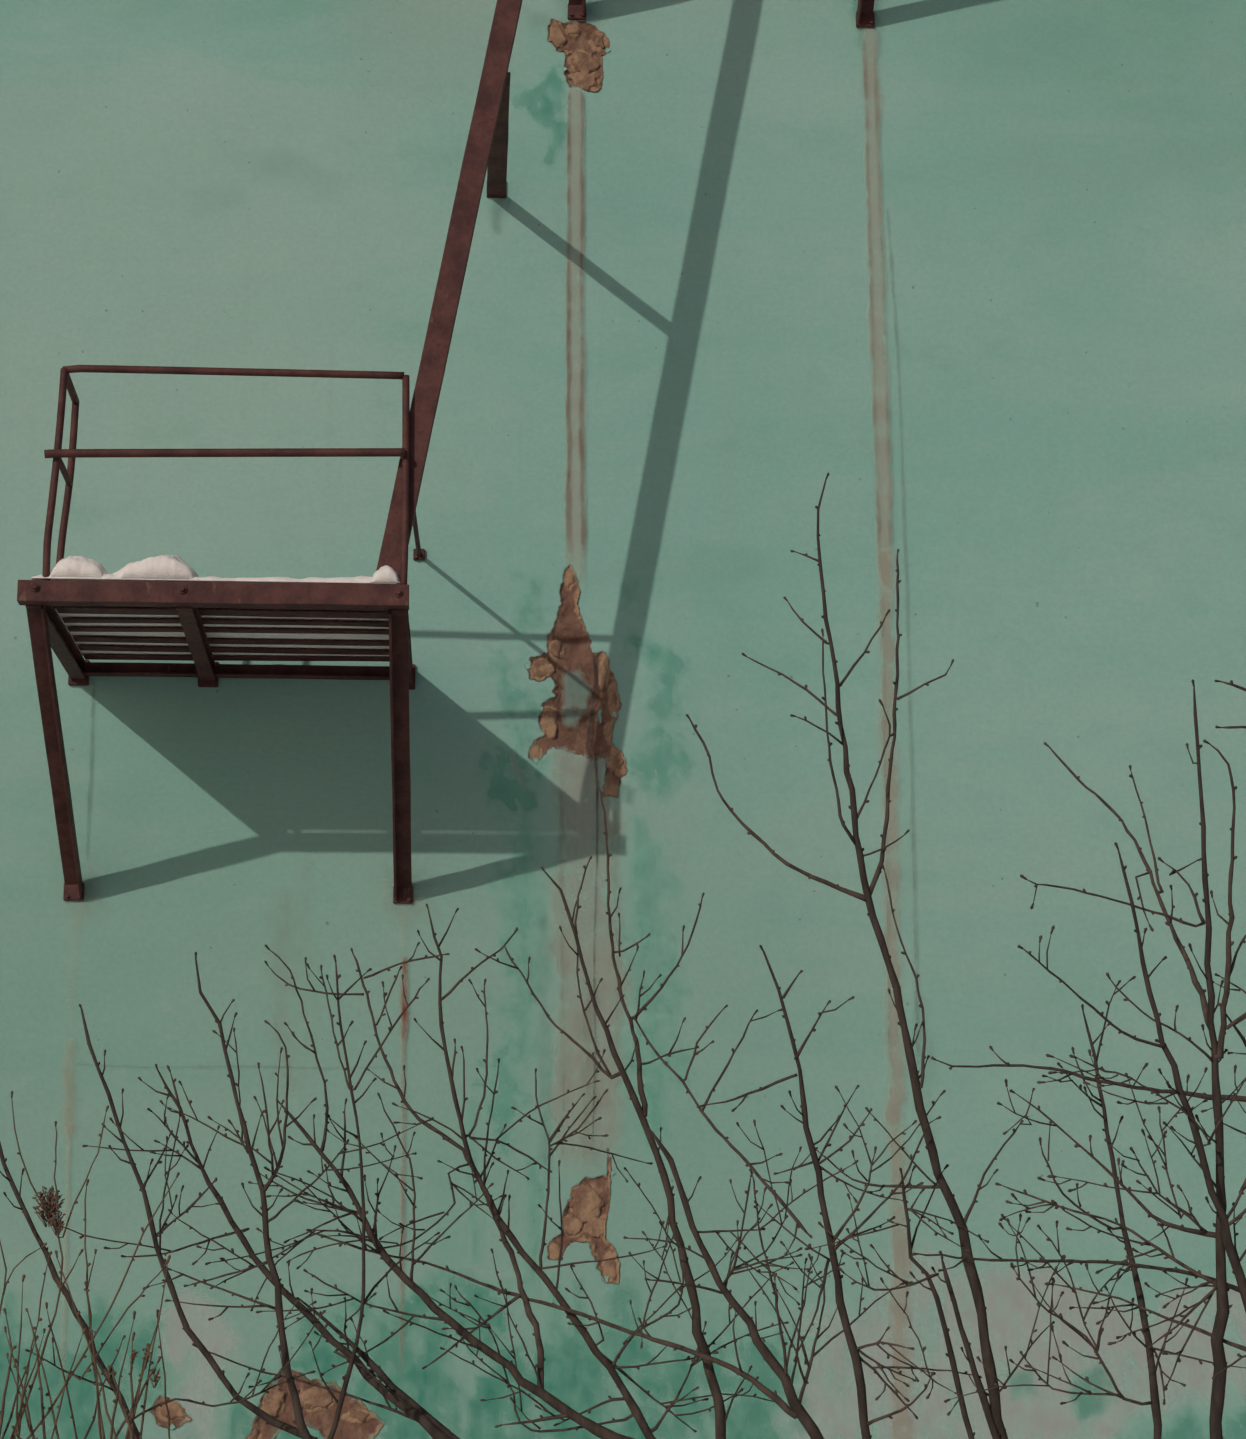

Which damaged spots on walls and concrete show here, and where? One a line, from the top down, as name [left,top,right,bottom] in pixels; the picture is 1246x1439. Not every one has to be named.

spalling [516,18,610,164]
rust [565,88,586,556]
rust [863,30,906,846]
spalling [524,564,690,797]
water stain [488,749,673,1153]
rust [885,864,914,1184]
water stain [0,1292,234,1439]
spalling [246,1368,385,1439]
water stain [290,1279,790,1439]
spalling [547,1147,620,1284]
rust [891,1207,911,1439]
water stain [794,1262,1246,1439]